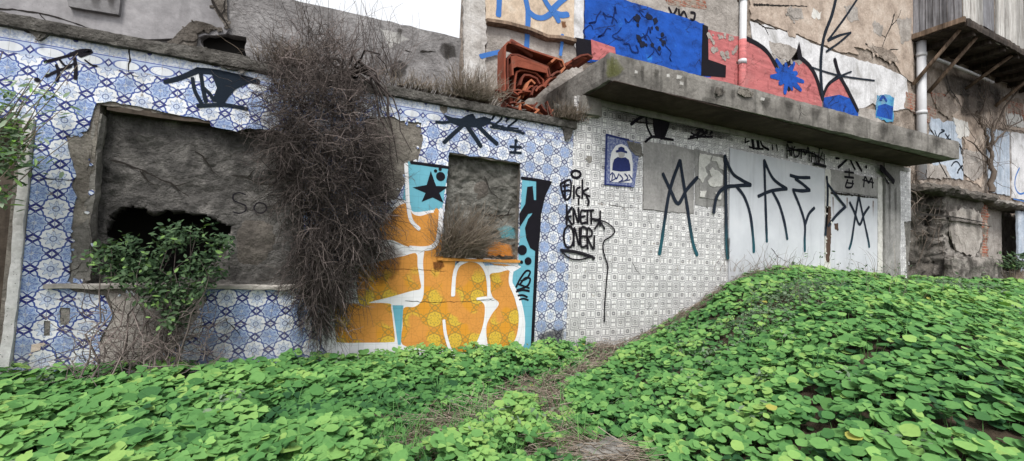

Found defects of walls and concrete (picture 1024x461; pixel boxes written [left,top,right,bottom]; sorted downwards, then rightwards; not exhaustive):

peeling [769,6,804,65]
peeling [67,132,95,284]
peeling [949,207,983,257]